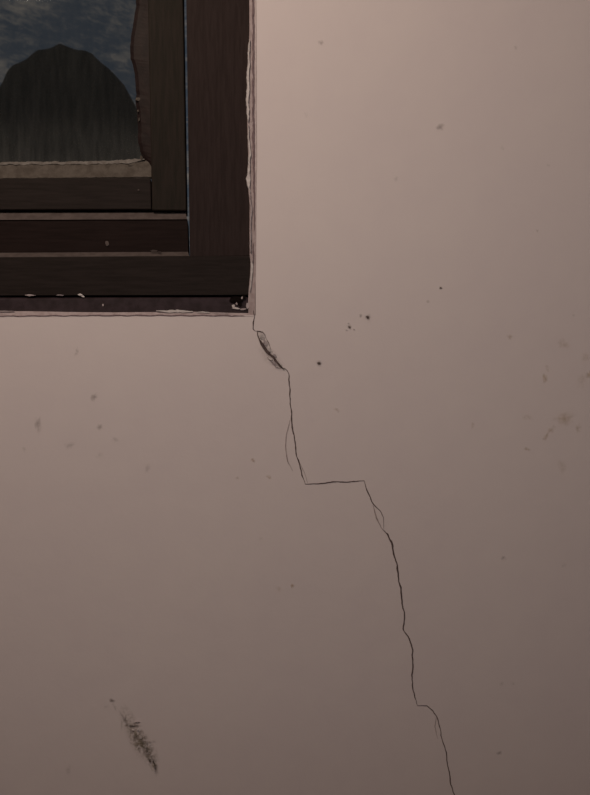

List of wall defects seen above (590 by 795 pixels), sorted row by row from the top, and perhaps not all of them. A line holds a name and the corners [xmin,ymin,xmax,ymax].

crack [284,368,455,795]